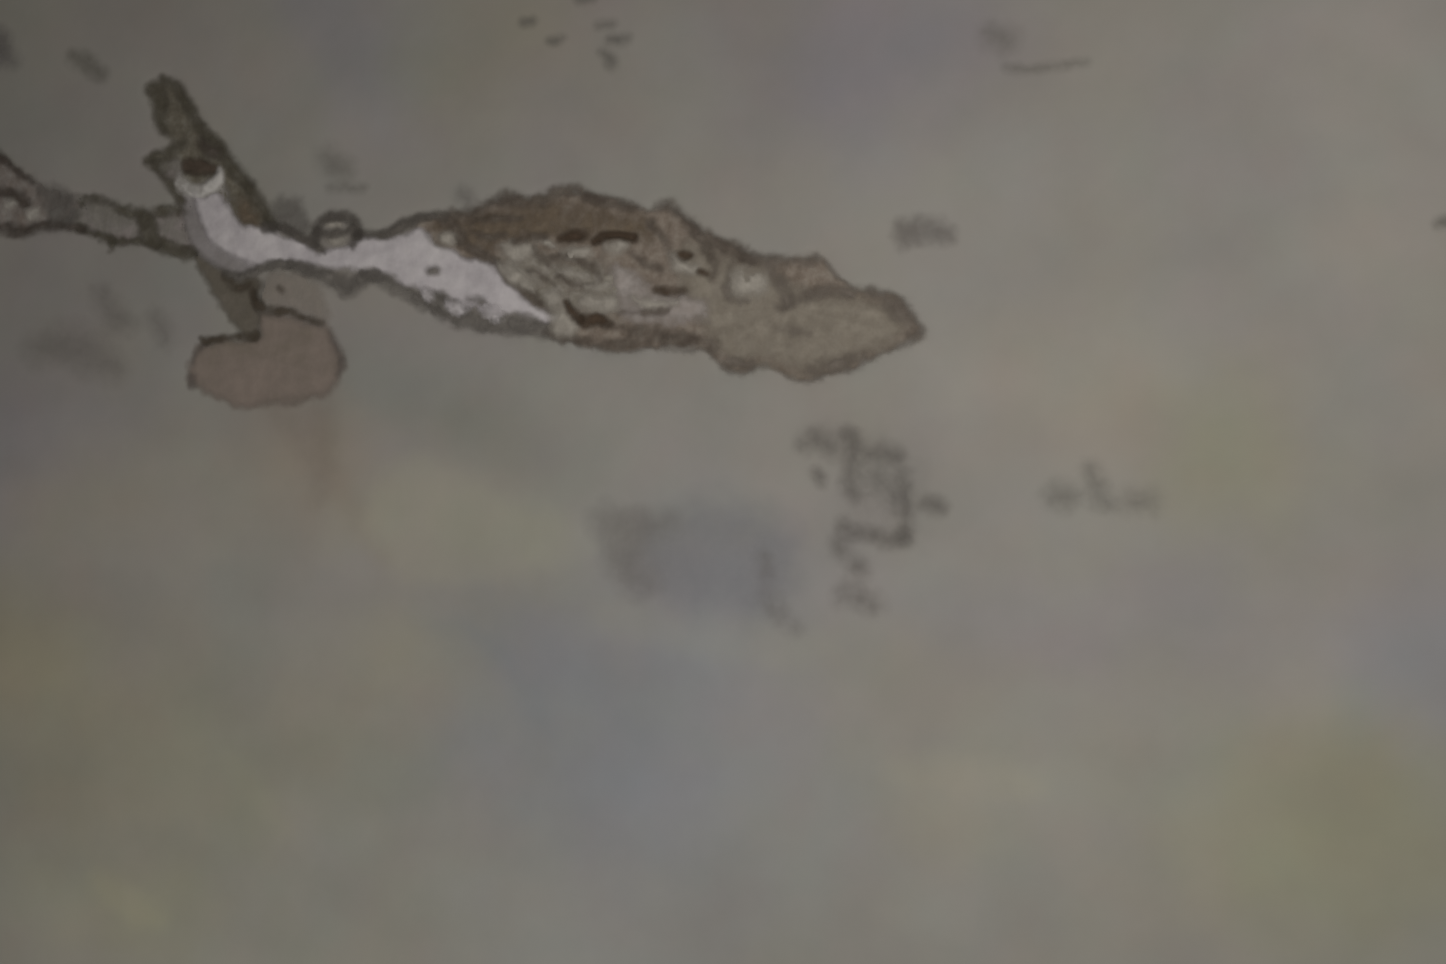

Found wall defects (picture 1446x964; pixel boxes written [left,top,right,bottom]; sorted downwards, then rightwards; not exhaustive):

spalling [0,155,85,237]
spalling [145,77,923,381]